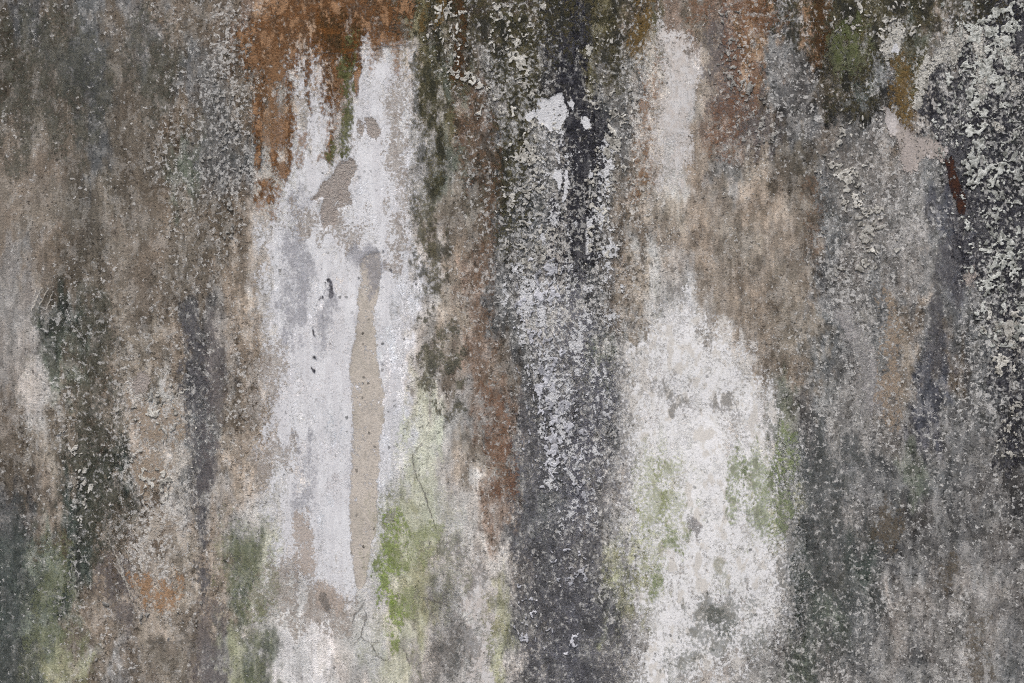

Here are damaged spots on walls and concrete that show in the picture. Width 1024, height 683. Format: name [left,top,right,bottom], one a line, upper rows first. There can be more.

rust [231,0,469,204]
peeling [349,251,385,589]
peeling [423,0,638,508]
damp [559,305,621,496]
peeling [814,0,1024,479]
rust [944,156,967,215]